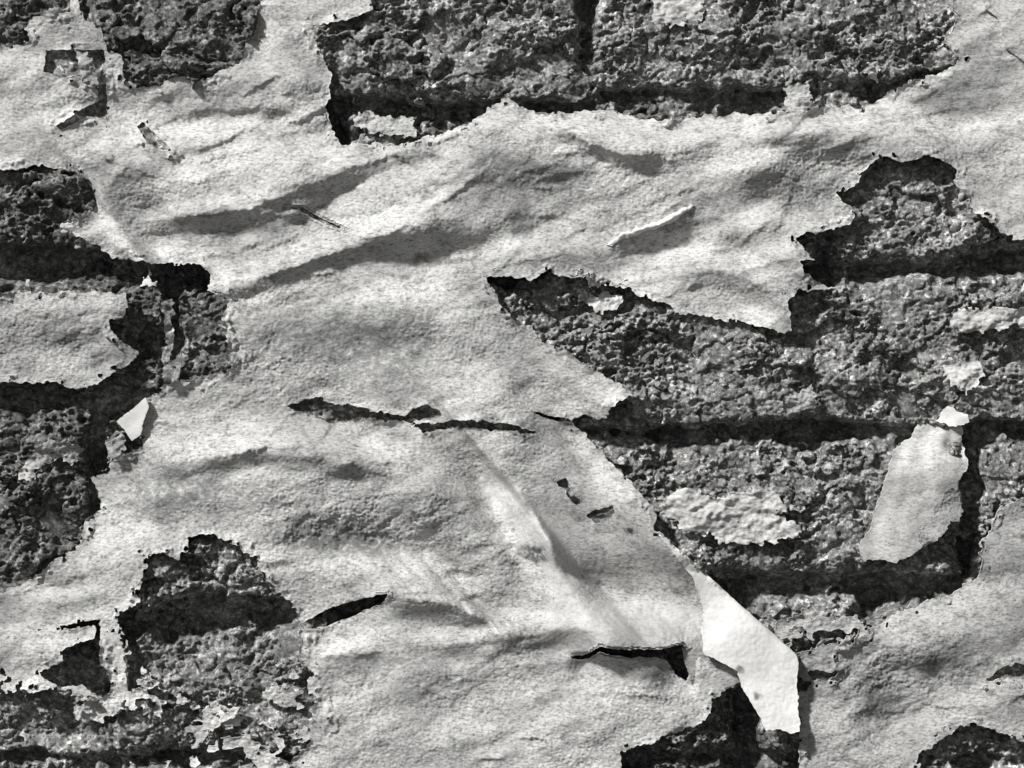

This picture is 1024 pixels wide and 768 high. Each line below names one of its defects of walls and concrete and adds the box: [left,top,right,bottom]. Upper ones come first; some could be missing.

spalling [0,0,71,49]
spalling [44,45,110,130]
spalling [82,0,262,89]
spalling [312,0,959,145]
spalling [0,164,239,592]
crack [288,396,574,435]
spalling [486,155,1024,768]
spalling [57,619,101,637]
spalling [104,534,327,768]
crack [314,594,388,626]
crack [571,645,689,681]
spalling [0,656,121,768]